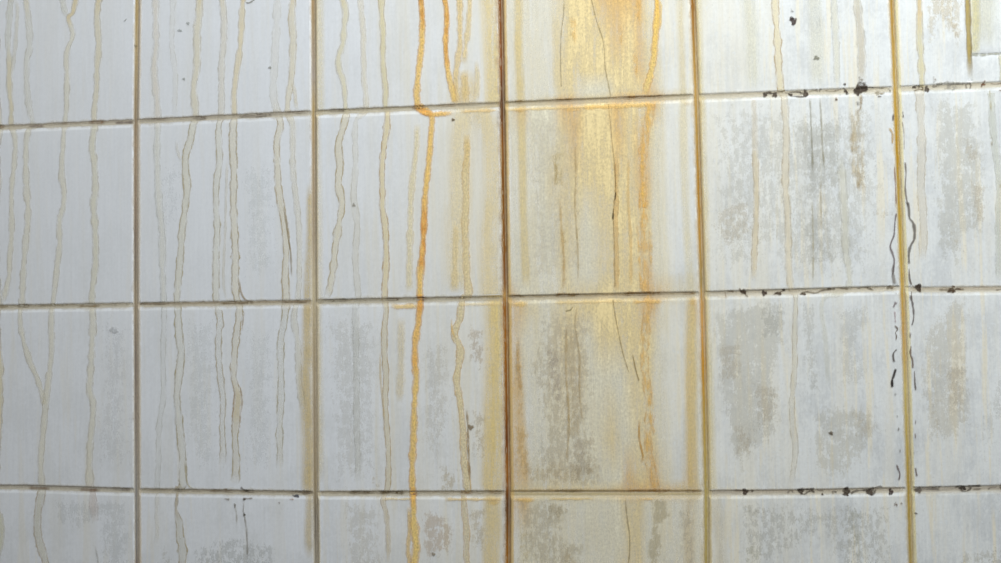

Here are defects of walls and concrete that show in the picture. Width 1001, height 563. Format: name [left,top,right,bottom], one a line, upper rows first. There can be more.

damp [763,0,817,114]
damp [835,42,884,103]
damp [213,0,251,515]
damp [278,207,291,337]
damp [379,111,391,390]
rust [396,0,471,563]
rust [450,0,712,563]
damp [762,177,848,296]
crack [890,115,916,389]
damp [792,486,902,505]